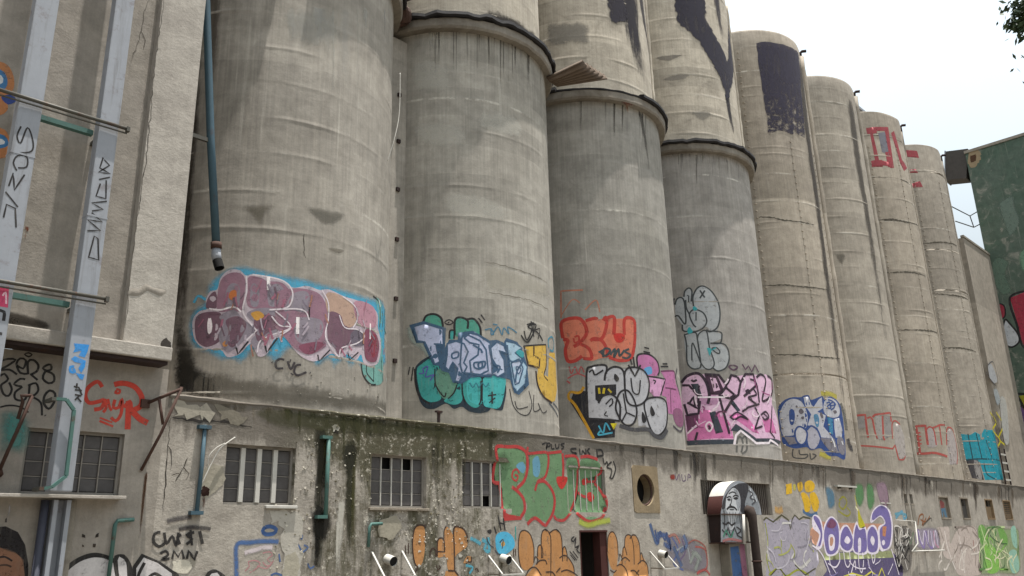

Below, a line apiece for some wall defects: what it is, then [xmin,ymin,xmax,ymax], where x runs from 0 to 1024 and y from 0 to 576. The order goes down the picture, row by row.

crack [125,0,164,323]
spalling [172,399,252,428]
leakage [176,329,398,565]